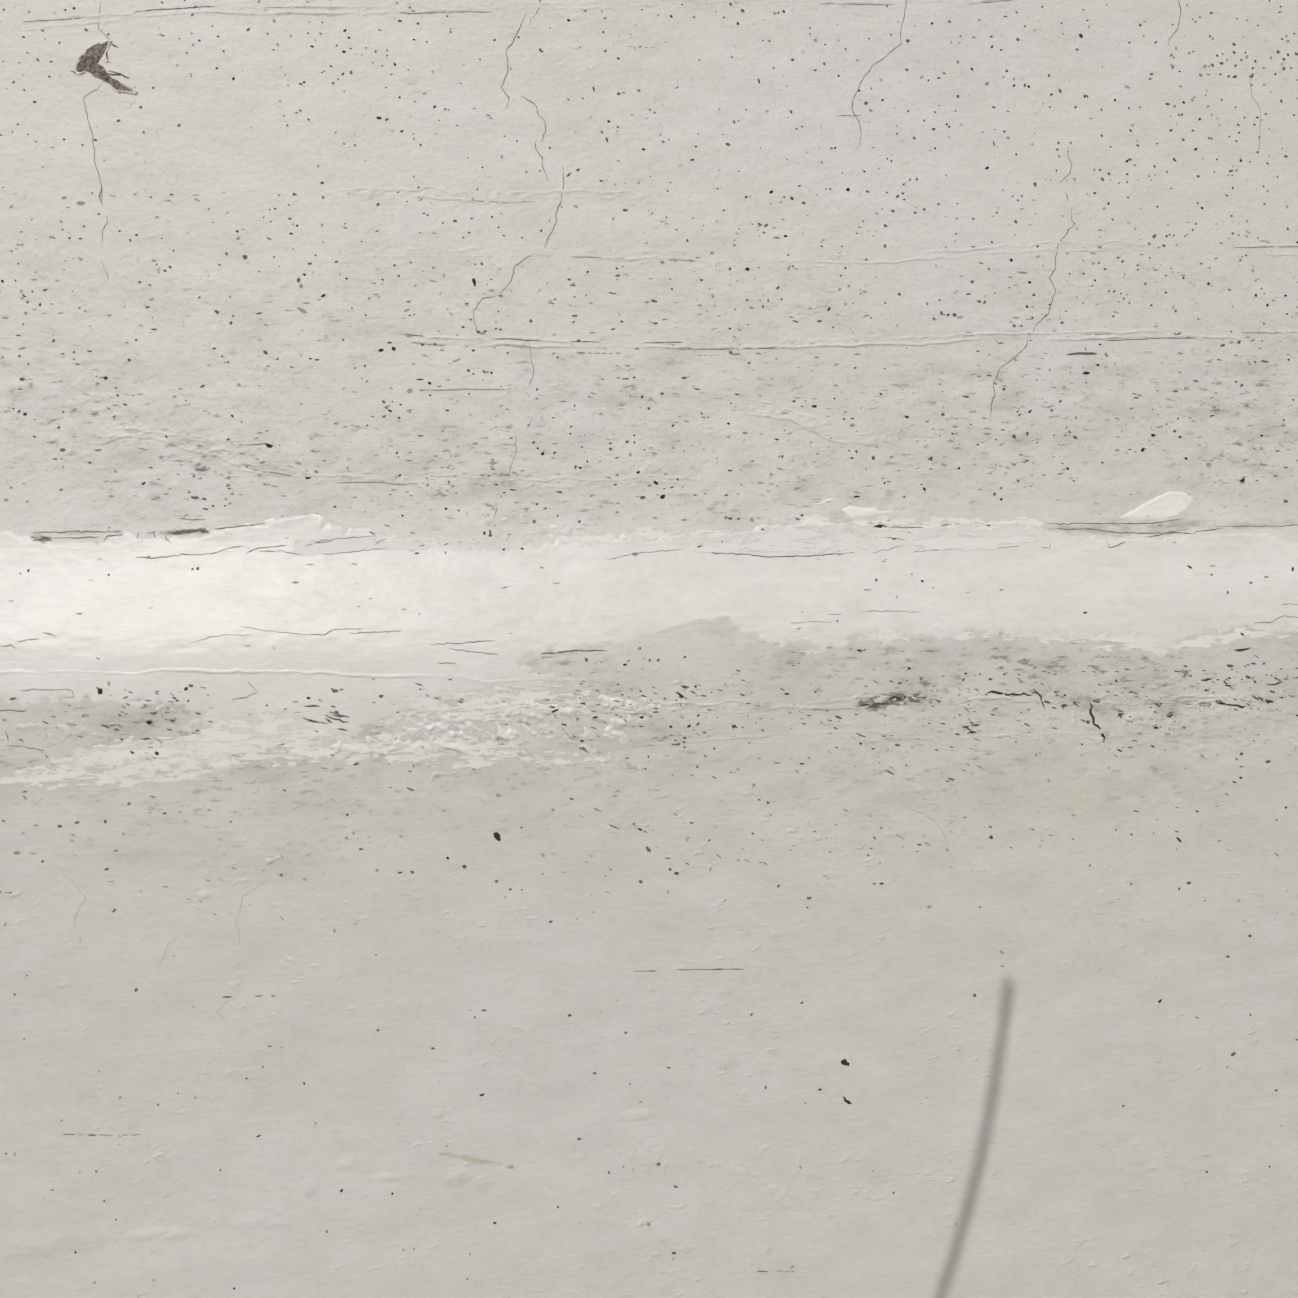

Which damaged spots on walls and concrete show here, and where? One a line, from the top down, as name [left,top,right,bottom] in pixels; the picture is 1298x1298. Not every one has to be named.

crack [83,86,108,277]
spalling [71,39,138,95]
crack [473,0,564,332]
crack [842,0,907,147]
crack [990,148,1075,417]
damp [0,676,644,795]